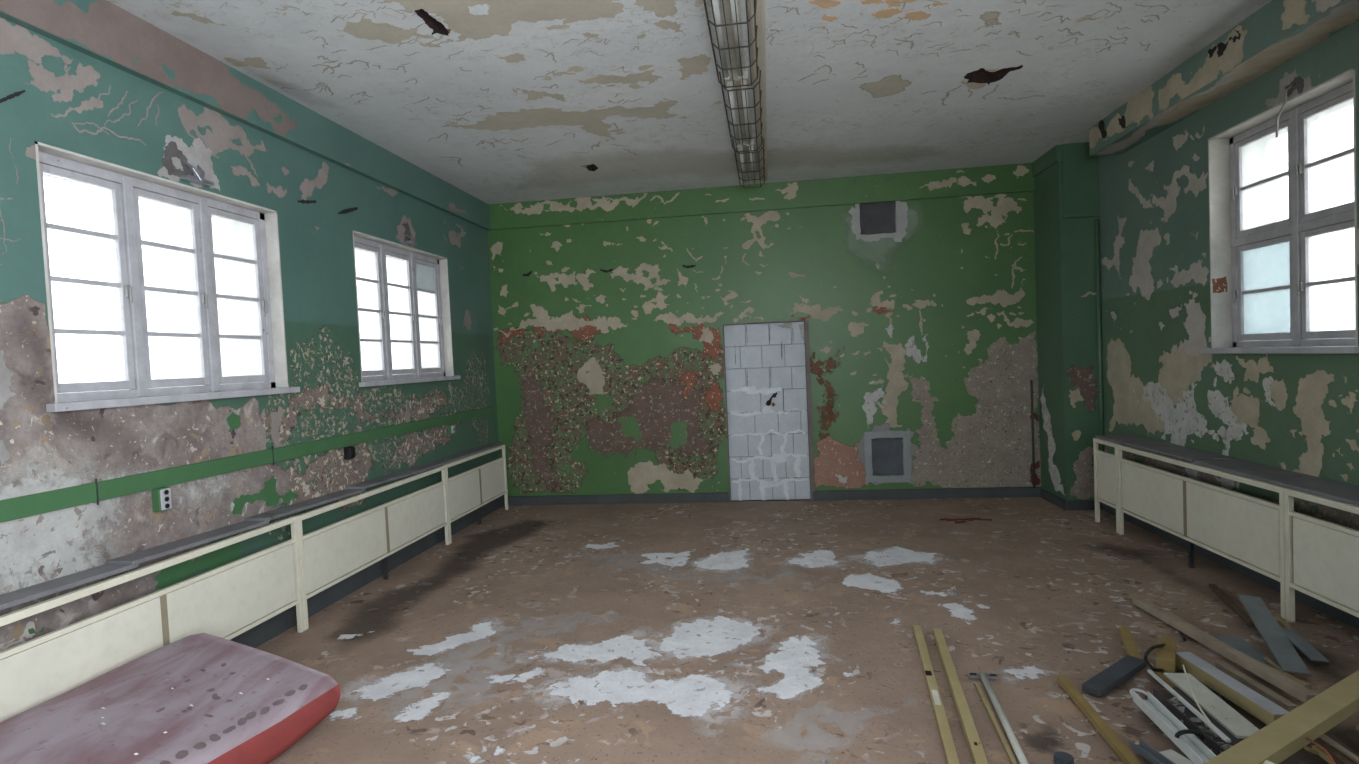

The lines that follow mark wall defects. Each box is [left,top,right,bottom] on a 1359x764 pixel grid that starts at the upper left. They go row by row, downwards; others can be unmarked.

crack [51,67,164,145]
peeling [0,0,350,201]
peeling [336,0,683,48]
peeling [497,53,526,63]
peeling [442,65,687,142]
peeling [677,54,711,80]
crack [0,210,20,265]
peeling [790,0,1359,531]
peeling [0,182,798,652]
peeling [486,667,544,684]